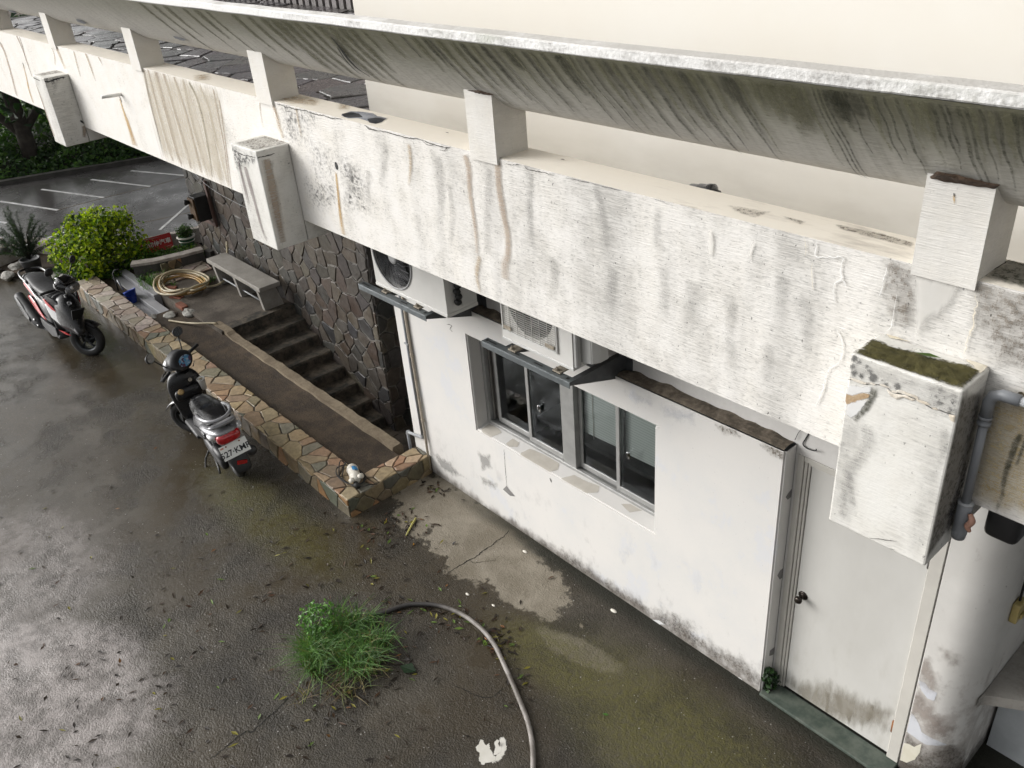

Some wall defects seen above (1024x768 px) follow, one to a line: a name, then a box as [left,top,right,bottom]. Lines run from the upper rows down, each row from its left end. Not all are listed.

water stain [142,5,1024,188]
water stain [464,156,476,237]
water stain [485,165,510,268]
crack [804,238,846,304]
water stain [886,264,954,325]
mould [976,261,1024,366]
crack [816,330,953,415]
peeling [845,378,937,418]
water stain [966,359,988,373]
water stain [1002,435,1024,495]
crack [447,530,509,573]
water stain [899,738,964,768]